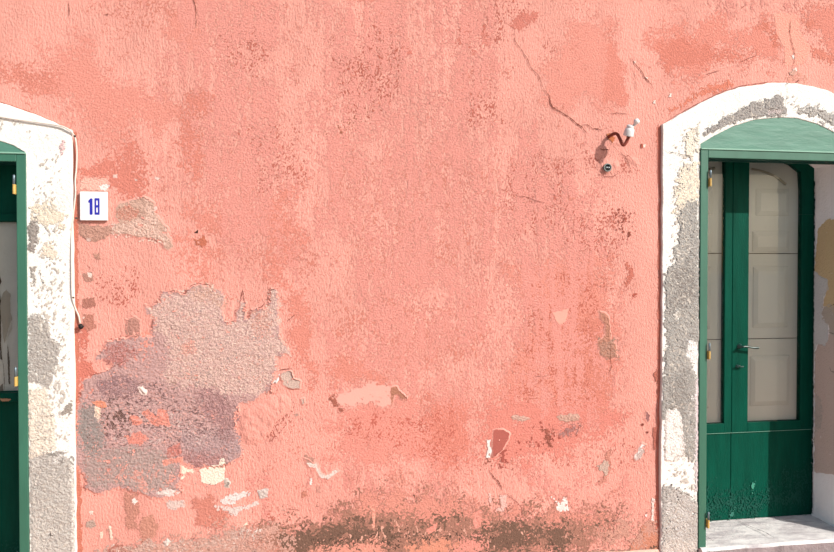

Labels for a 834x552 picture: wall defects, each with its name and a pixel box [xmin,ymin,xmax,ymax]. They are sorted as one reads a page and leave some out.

crack [514,31,632,177]
spalling [703,94,788,136]
spalling [798,103,834,126]
peeling [27,0,658,552]
spalling [653,199,700,463]
peeling [814,219,834,475]
peeling [645,483,698,552]